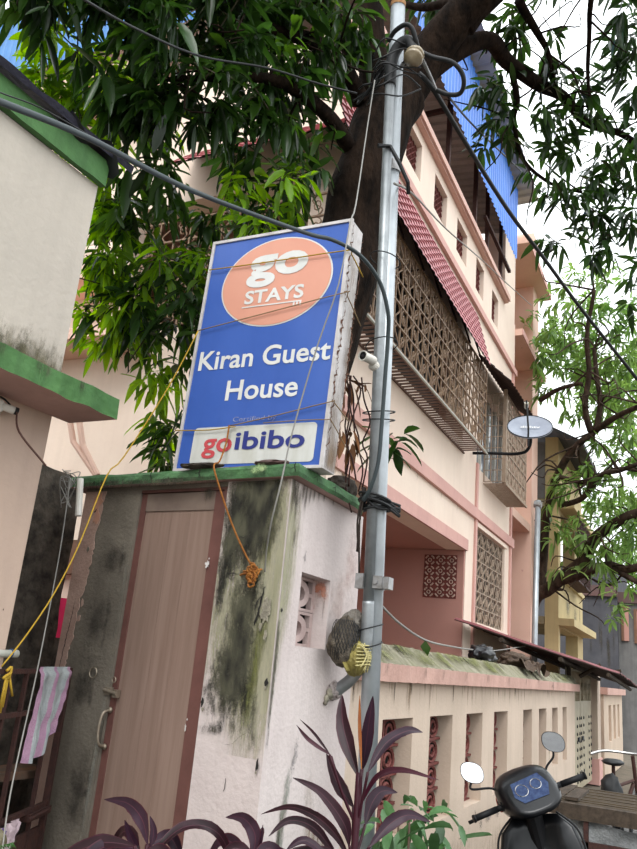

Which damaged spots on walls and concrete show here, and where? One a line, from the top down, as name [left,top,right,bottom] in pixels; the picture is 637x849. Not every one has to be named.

water stain [203,480,282,750]
water stain [292,480,334,513]